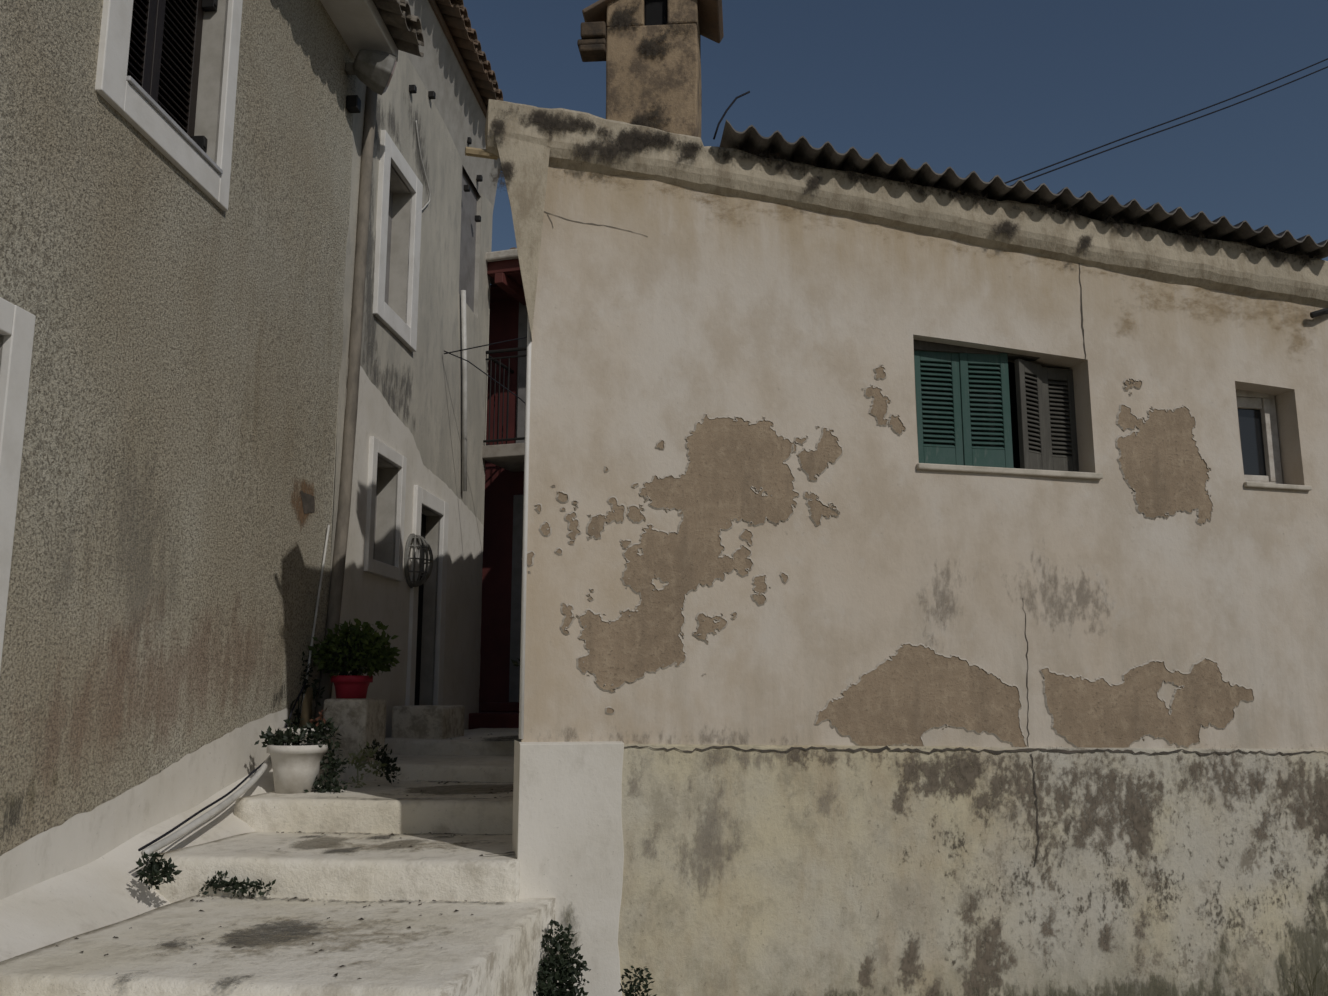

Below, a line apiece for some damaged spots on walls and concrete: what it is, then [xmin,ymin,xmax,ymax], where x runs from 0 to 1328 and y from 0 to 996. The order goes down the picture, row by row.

damp [639,20,693,60]
damp [487,119,506,143]
damp [578,118,608,135]
damp [625,103,714,164]
crack [1078,263,1086,360]
peeling [861,364,906,436]
peeling [1115,377,1213,526]
peeling [534,413,843,715]
peeling [814,642,1028,747]
crack [624,598,1328,867]
peeling [1039,657,1255,748]
damp [787,747,1328,996]